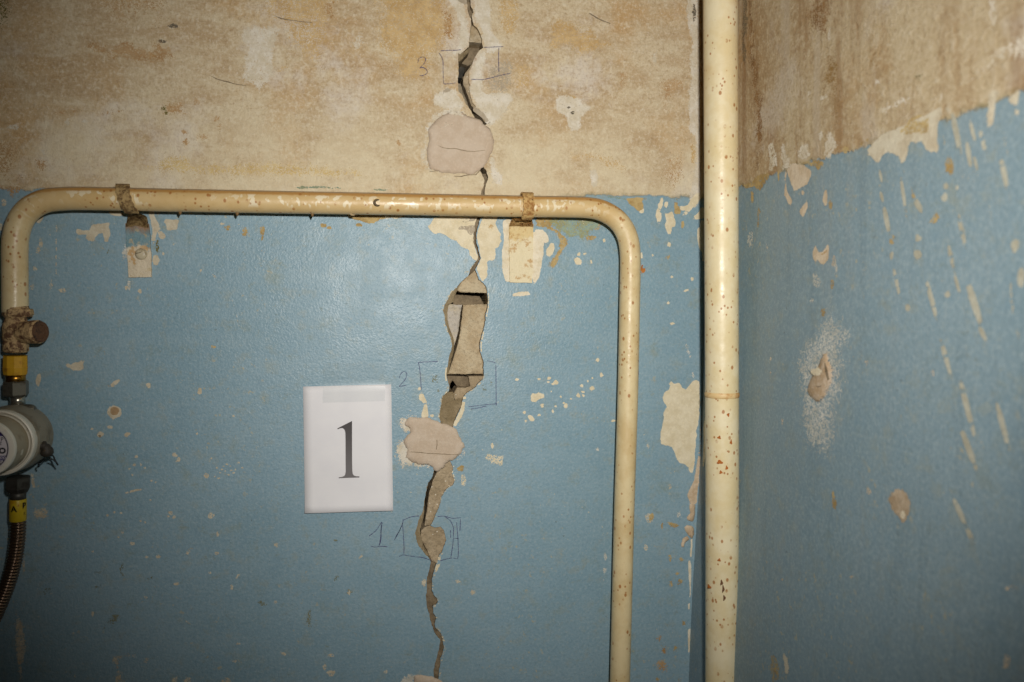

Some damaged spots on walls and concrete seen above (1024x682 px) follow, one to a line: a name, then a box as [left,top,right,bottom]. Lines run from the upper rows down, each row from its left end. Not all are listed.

crack [458,0,487,125]
peeling [76,211,123,242]
peeling [149,211,179,266]
crack [430,146,484,177]
spalling [418,216,605,427]
peeling [608,0,704,268]
peeling [743,90,1020,247]
peeling [926,245,987,341]
peeling [940,339,978,472]
crack [415,446,459,679]
peeling [647,373,705,609]
spalling [888,489,910,523]